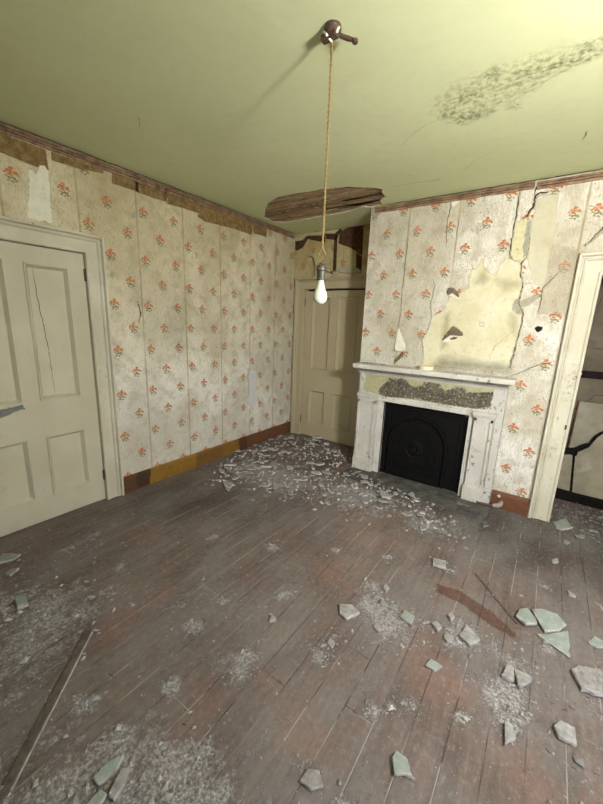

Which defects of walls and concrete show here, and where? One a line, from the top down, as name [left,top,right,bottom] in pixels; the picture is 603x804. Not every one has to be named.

peeling [0,133,267,236]
crack [387,168,603,375]
flaking render [510,218,532,262]
peeling [363,374,494,409]